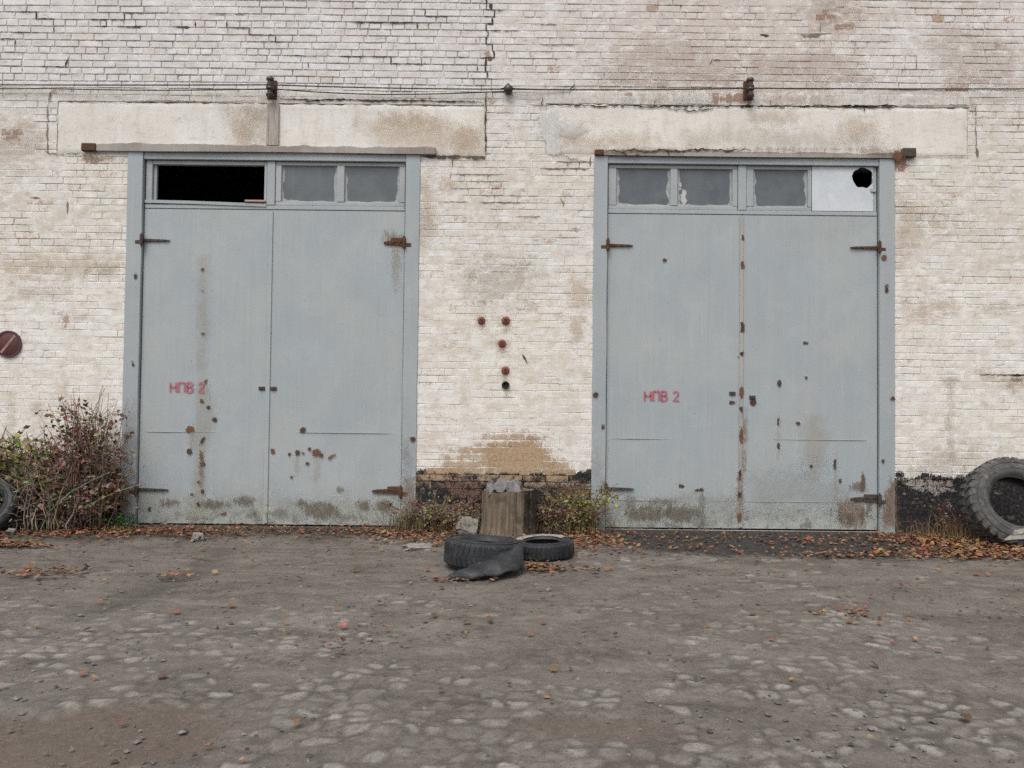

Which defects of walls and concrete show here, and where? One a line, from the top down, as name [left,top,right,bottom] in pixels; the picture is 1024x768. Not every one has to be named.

crack [281,0,571,217]
rust [185,426,205,506]
rust [288,447,336,465]
rust [729,386,757,522]
rust [833,459,898,528]